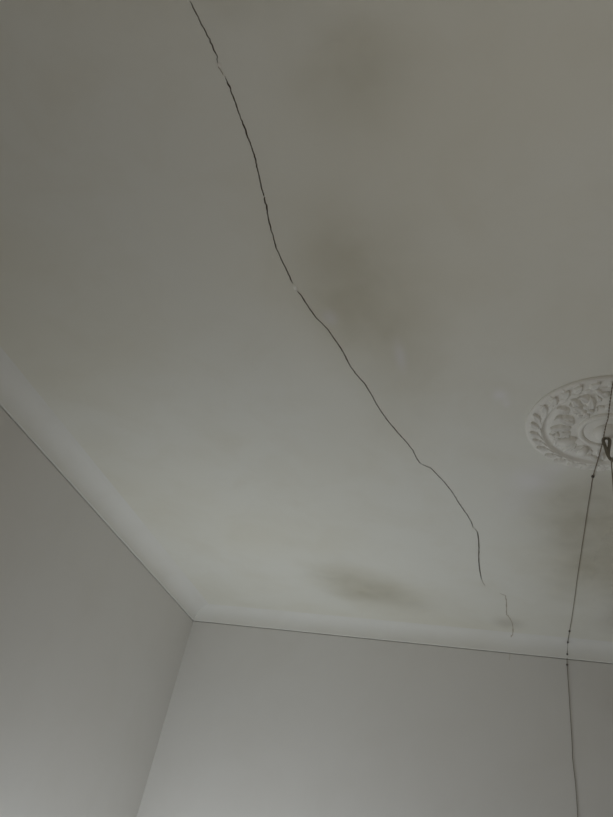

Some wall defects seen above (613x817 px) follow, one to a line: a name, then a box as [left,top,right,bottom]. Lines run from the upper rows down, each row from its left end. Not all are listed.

crack [187,0,514,637]